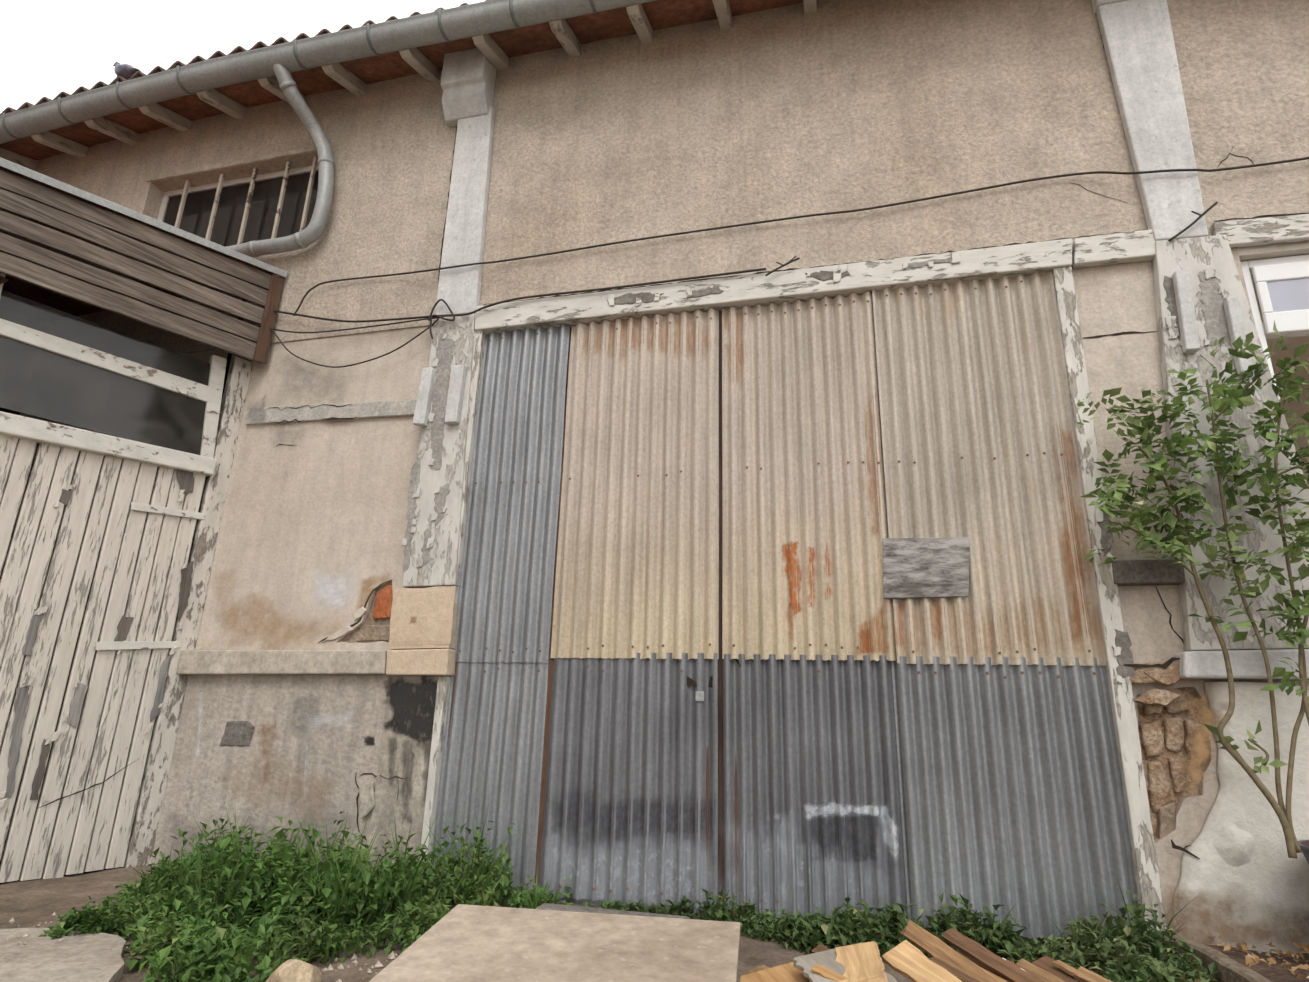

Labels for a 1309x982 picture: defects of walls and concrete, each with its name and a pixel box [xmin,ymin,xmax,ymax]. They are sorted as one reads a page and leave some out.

peeling [805,265,850,284]
peeling [1163,275,1182,347]
peeling [176,469,197,501]
peeling [322,332,455,643]
peeling [114,615,134,654]
peeling [176,561,194,630]
rust [783,543,830,614]
peeling [0,674,35,808]
peeling [30,682,88,800]
leakage [365,676,437,822]
flaking render [1112,629,1208,840]
crack [355,772,403,850]